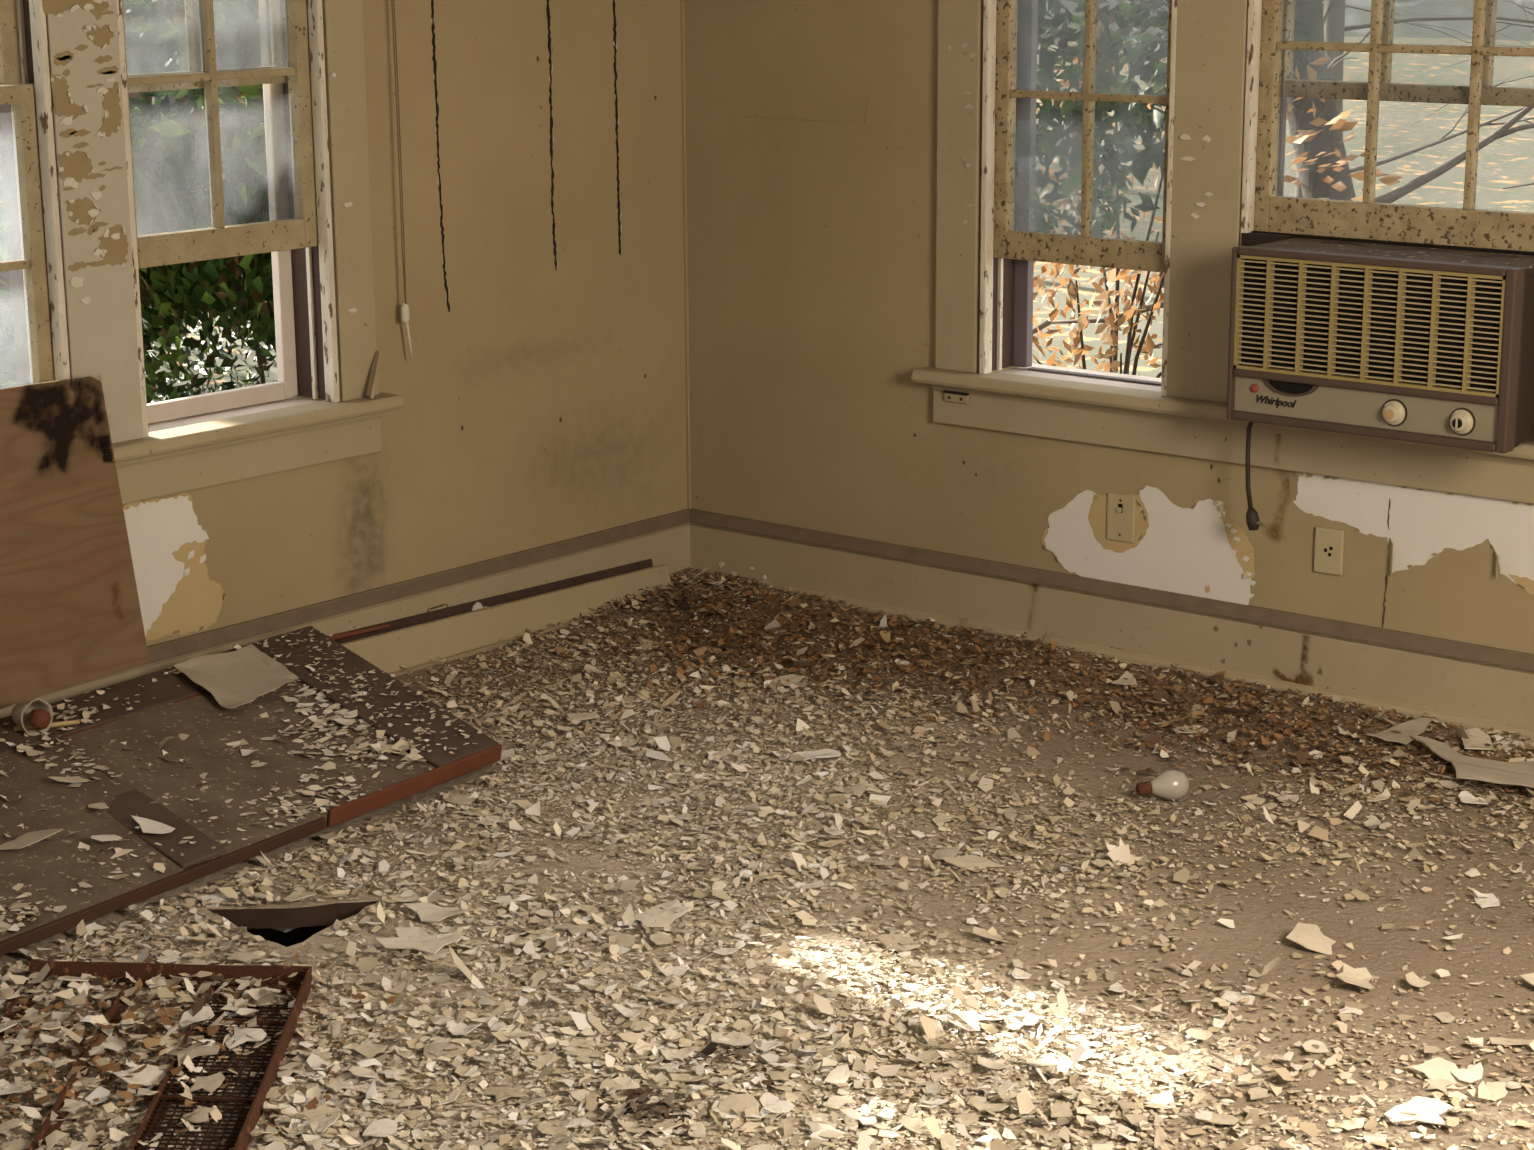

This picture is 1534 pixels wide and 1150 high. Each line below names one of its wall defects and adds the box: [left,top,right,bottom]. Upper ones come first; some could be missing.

peeling [42,0,129,304]
crack [431,0,450,312]
crack [546,0,559,270]
crack [612,0,622,255]
peeling [123,493,228,641]
peeling [1042,485,1256,605]
peeling [1289,472,1534,595]